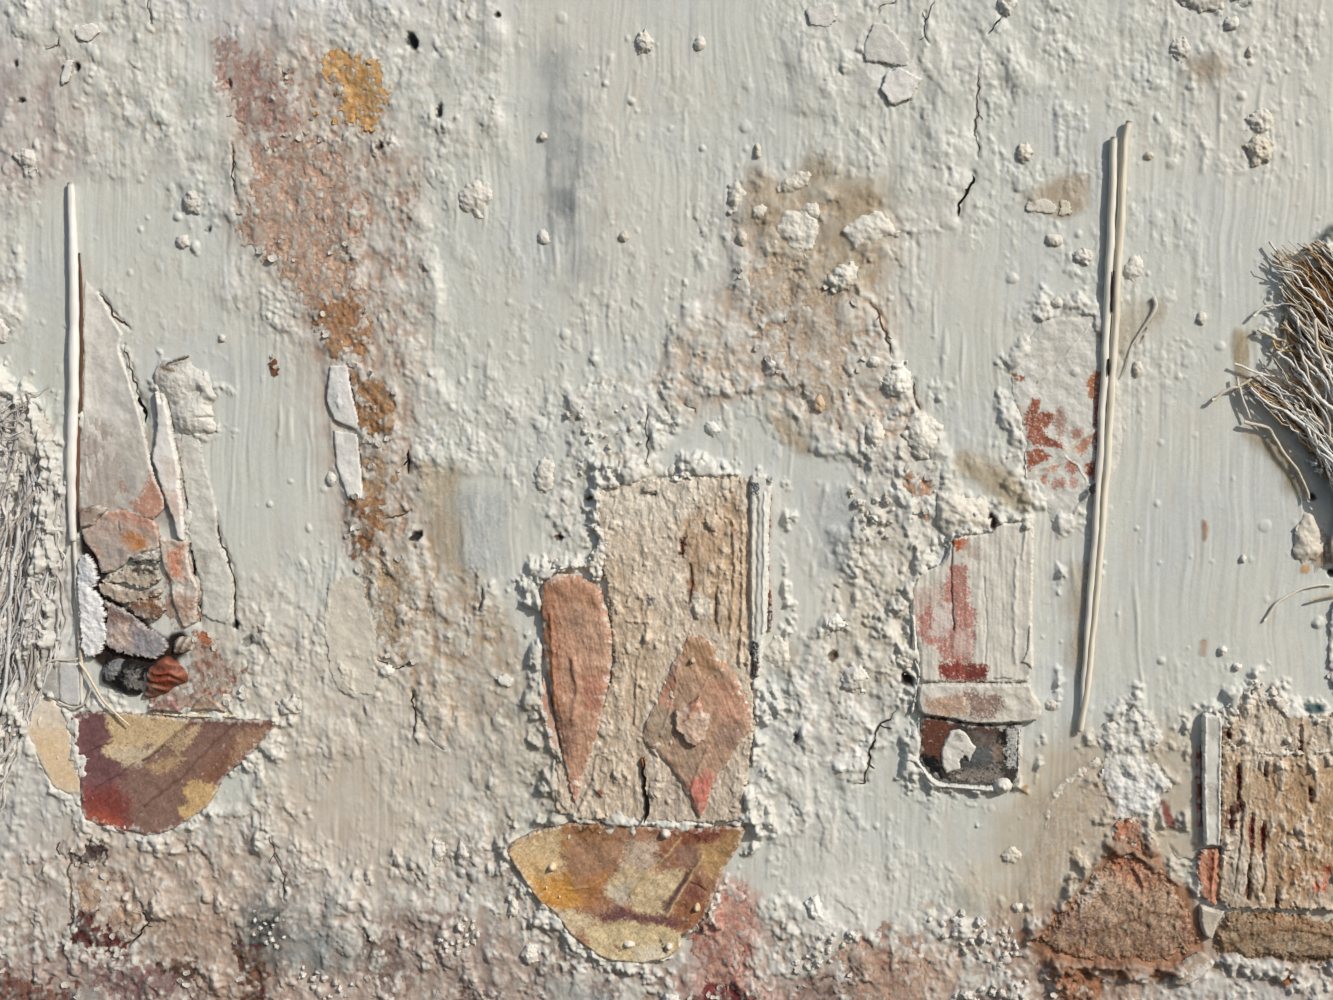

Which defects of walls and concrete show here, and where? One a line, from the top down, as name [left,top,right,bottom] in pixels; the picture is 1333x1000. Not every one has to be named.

crack [958,72,983,215]